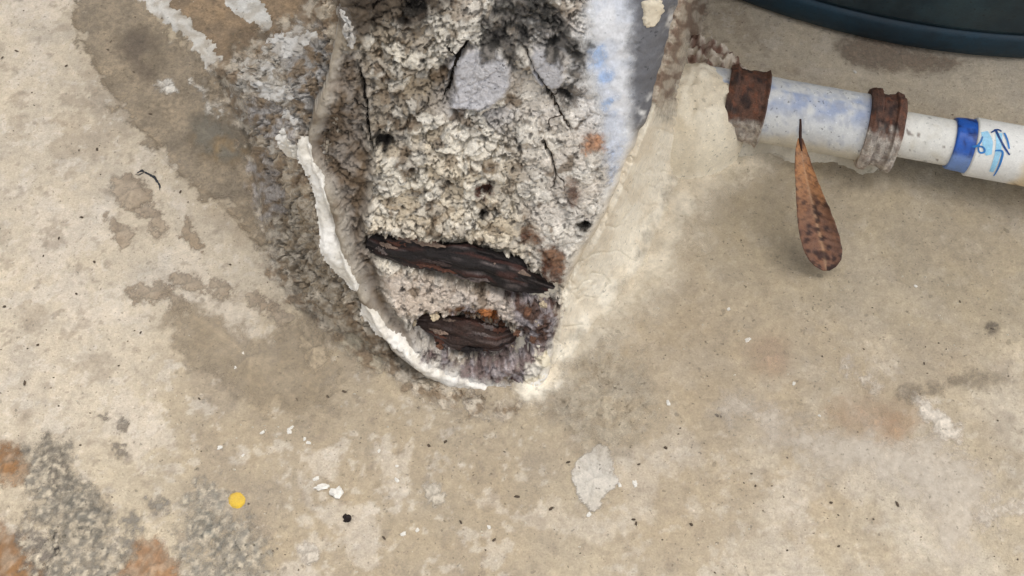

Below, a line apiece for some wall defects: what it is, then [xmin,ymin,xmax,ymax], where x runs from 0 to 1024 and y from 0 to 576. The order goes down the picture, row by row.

crack [352,67,375,154]
crack [444,40,469,95]
crack [526,47,574,192]
spalling [71,0,619,420]
corrosion [568,180,578,207]
corrosion [521,230,566,284]
corrosion [421,290,565,389]